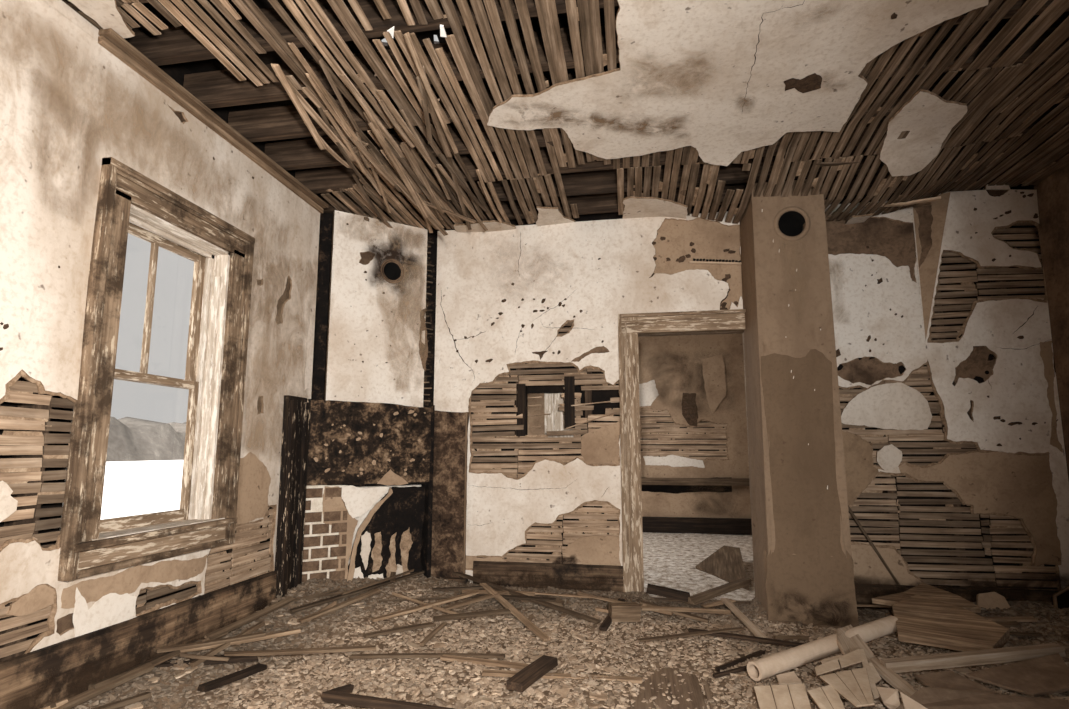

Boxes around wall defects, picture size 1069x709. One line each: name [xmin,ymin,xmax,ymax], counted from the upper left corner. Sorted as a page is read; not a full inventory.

crack [742,0,805,112]
spalling [984,185,1034,198]
crack [441,296,484,379]
spalling [556,310,583,337]
spalling [826,205,1047,343]
spalling [0,370,76,551]
spalling [0,452,276,658]
spalling [466,500,621,570]
spalling [468,350,620,480]
spalling [639,355,729,468]
peeling [761,335,1063,628]